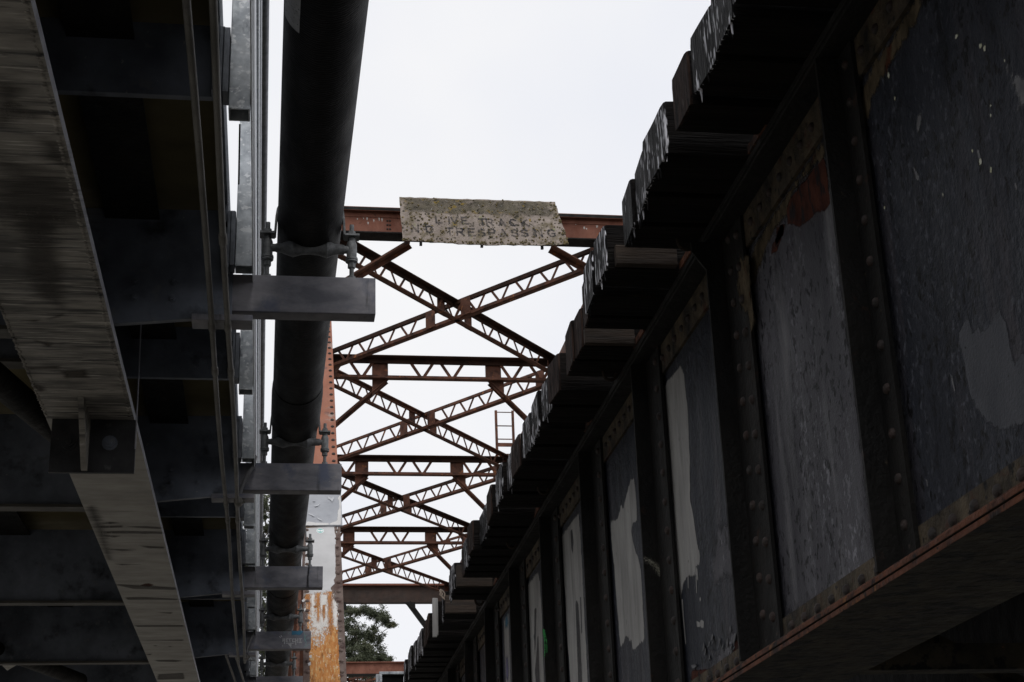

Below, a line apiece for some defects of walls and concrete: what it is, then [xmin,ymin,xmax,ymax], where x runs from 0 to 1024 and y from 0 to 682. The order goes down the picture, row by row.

peeling [959,309,1024,432]
rust [304,591,340,682]
peeling [611,478,644,650]
peeling [664,366,737,669]